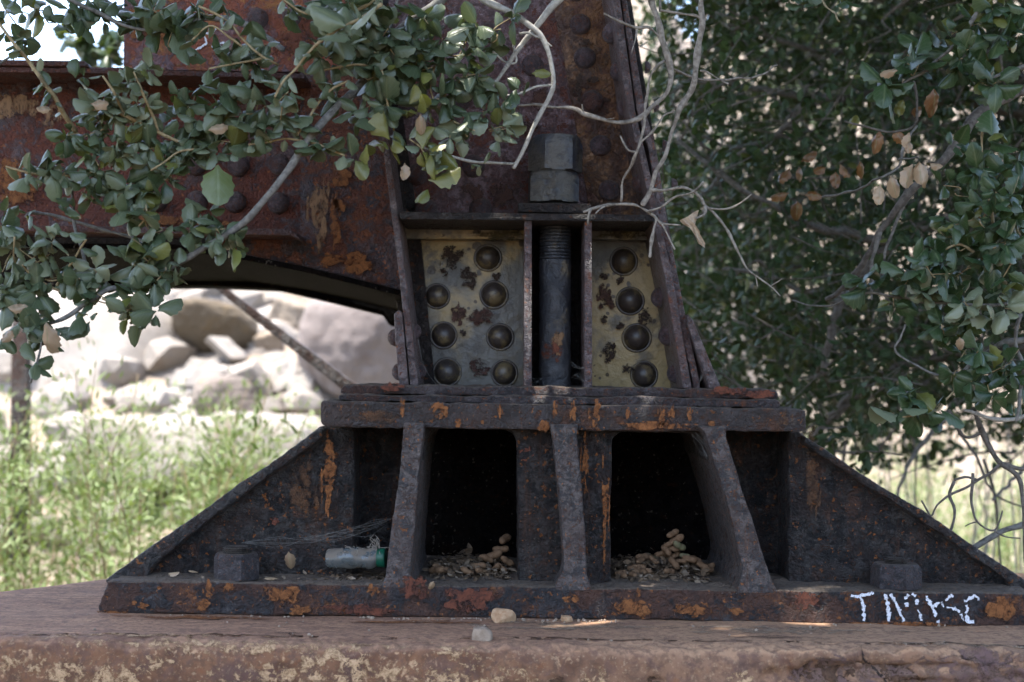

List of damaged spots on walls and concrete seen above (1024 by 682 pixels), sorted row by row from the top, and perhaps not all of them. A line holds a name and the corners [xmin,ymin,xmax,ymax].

corrosion [0,93,40,120]
corrosion [0,157,40,207]
corrosion [305,169,374,275]
corrosion [431,401,461,428]
corrosion [618,404,715,431]
corrosion [289,429,337,518]
corrosion [602,455,610,564]
corrosion [97,578,264,619]
corrosion [262,583,500,624]
corrosion [611,588,654,617]
corrosion [673,603,713,618]
corrosion [984,596,1016,620]